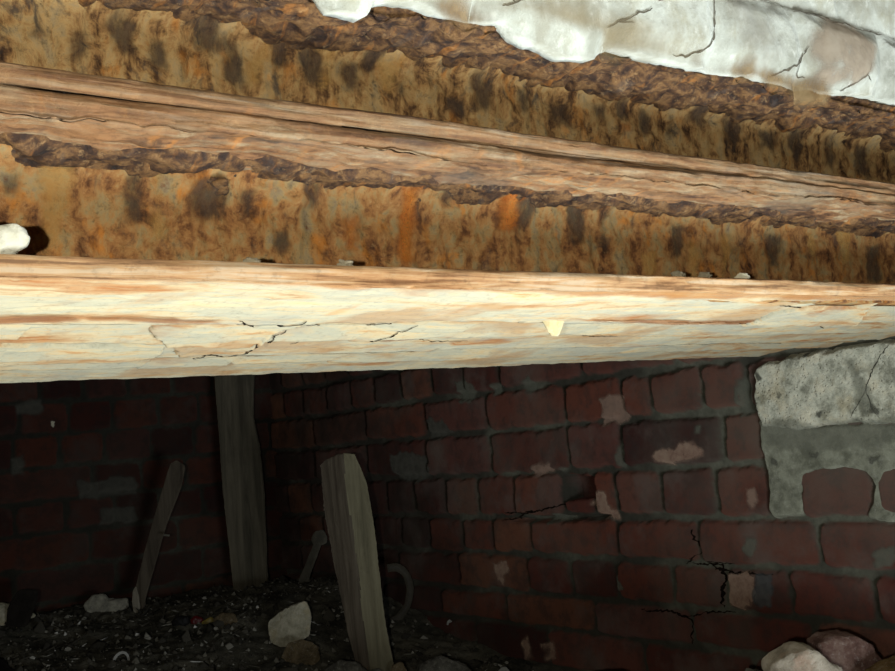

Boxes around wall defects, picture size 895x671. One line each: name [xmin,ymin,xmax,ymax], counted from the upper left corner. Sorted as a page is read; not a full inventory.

corrosion [165,7,242,83]
corrosion [344,50,386,88]
corrosion [0,129,895,281]
corrosion [613,294,895,328]
crack [193,321,319,359]
crack [365,323,461,342]
crack [850,344,889,418]
spalling [599,394,630,425]
spalling [653,442,703,465]
spalling [593,491,620,519]
crack [641,529,773,644]
spalling [728,571,773,610]